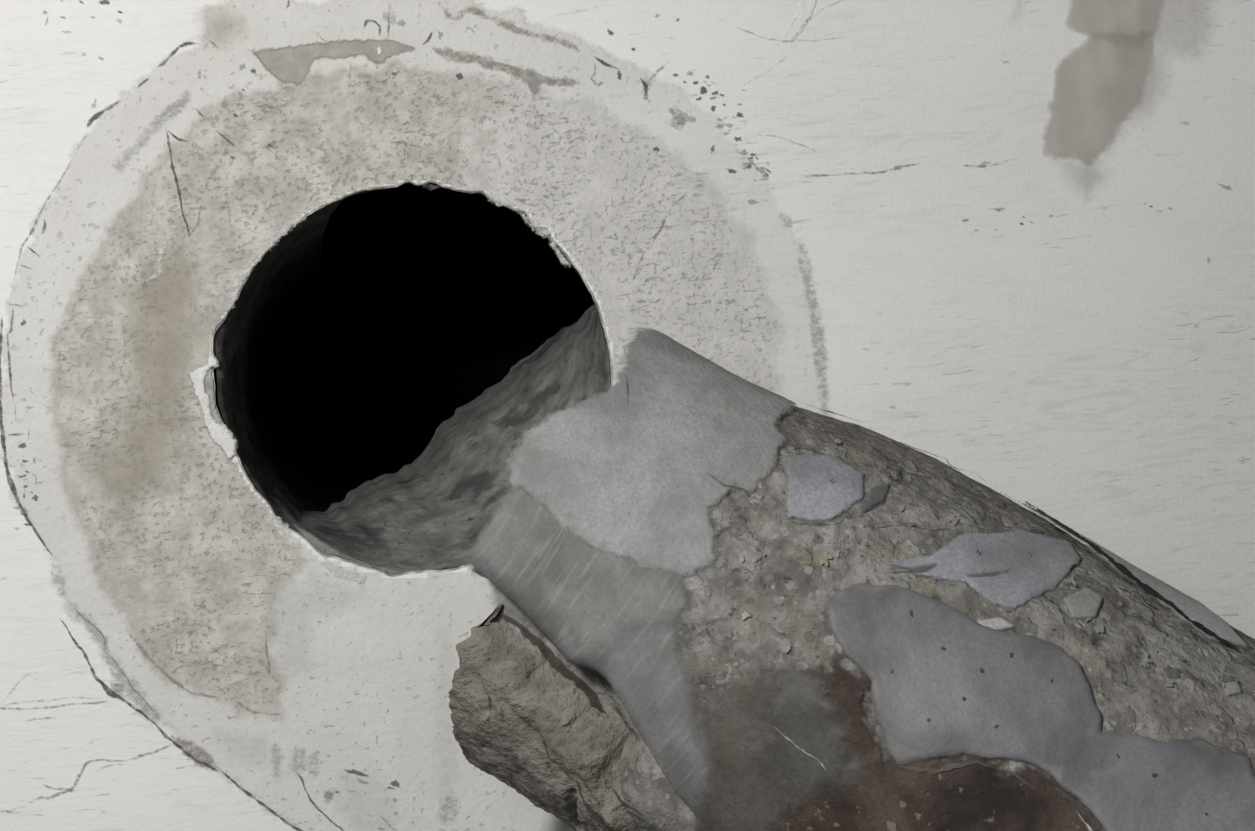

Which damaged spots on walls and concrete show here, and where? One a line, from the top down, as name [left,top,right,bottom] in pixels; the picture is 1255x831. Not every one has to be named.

leakage [1046,0,1157,181]
leakage [695,665,842,831]